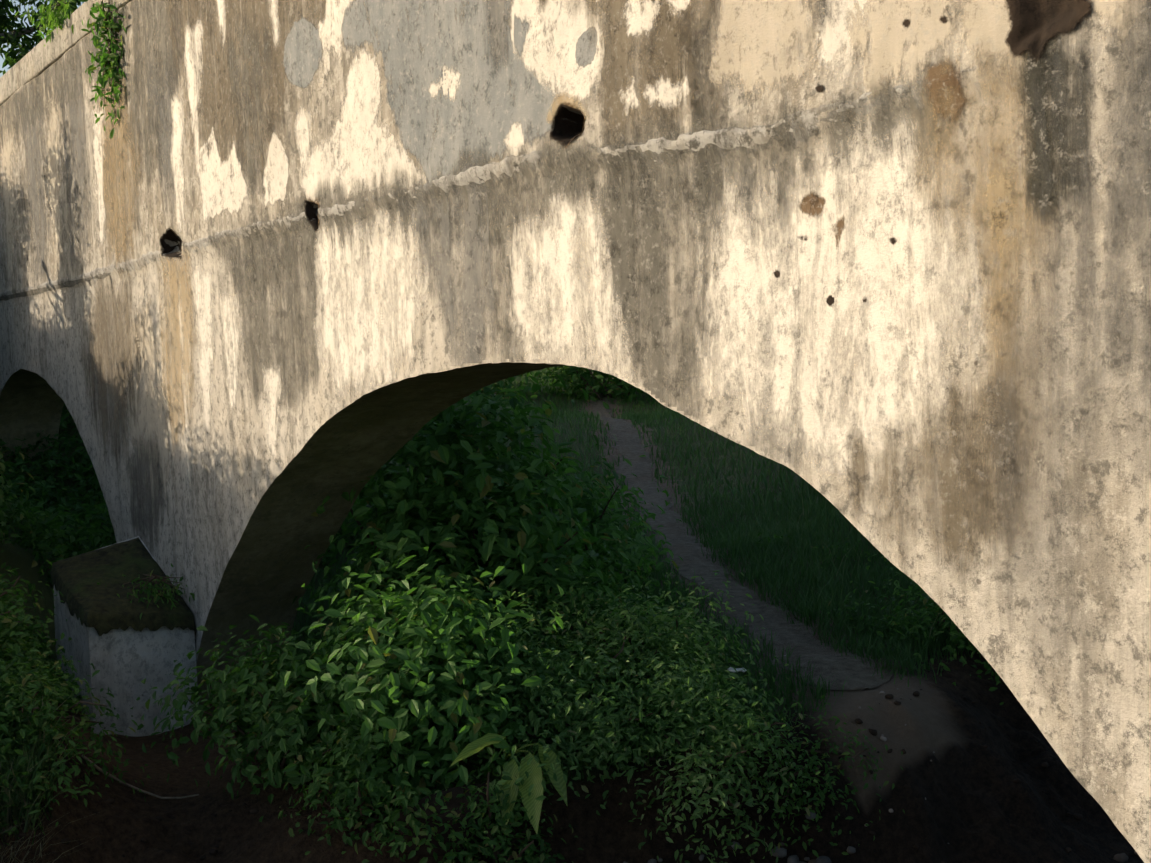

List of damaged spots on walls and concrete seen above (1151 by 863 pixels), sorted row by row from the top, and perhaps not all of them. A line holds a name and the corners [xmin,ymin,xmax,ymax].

water stain [82,279,164,547]
peeling [170,21,250,237]
water stain [0,0,810,455]
peeling [263,0,605,396]
peeling [508,190,632,382]
peeling [619,75,689,116]
peeling [624,0,690,36]
water stain [816,0,871,86]
water stain [827,64,953,196]
rust [848,76,1035,567]
rust [924,60,967,165]
peeling [847,0,1147,97]